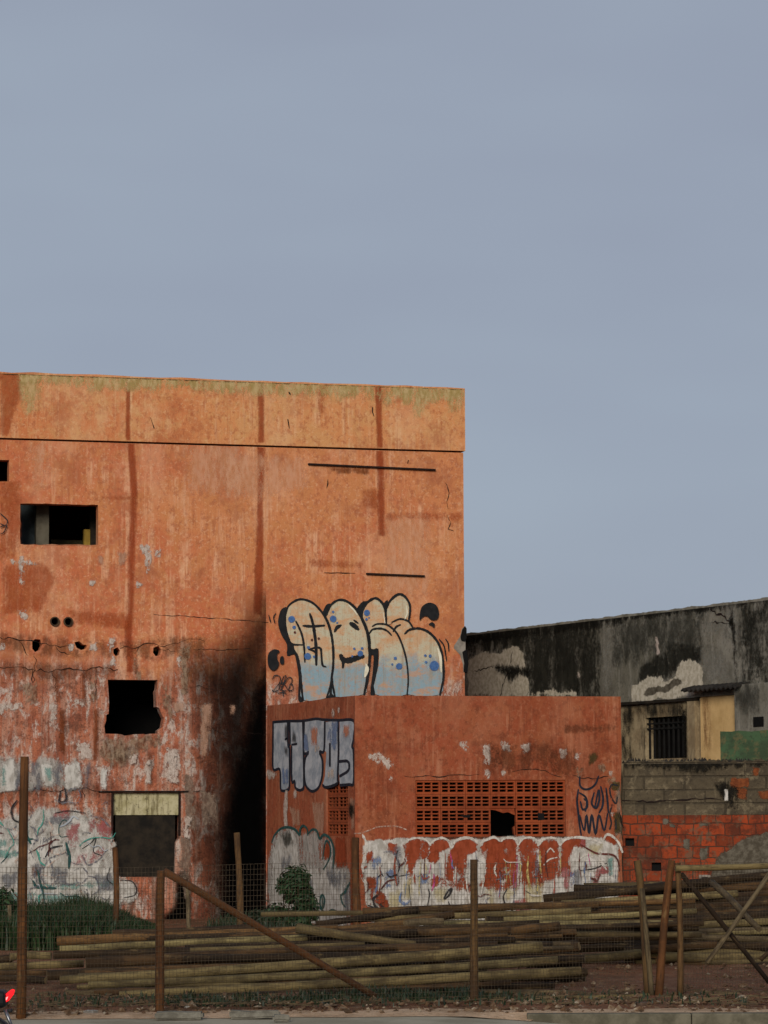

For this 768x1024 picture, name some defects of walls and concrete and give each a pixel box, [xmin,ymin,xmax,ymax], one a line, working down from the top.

crack [0,614,269,699]
peeling [454,626,577,696]
damp [466,600,768,710]
peeling [631,659,703,704]
damp [200,705,211,756]
peeling [368,753,392,780]
peeling [483,741,531,778]
peeling [76,735,218,899]